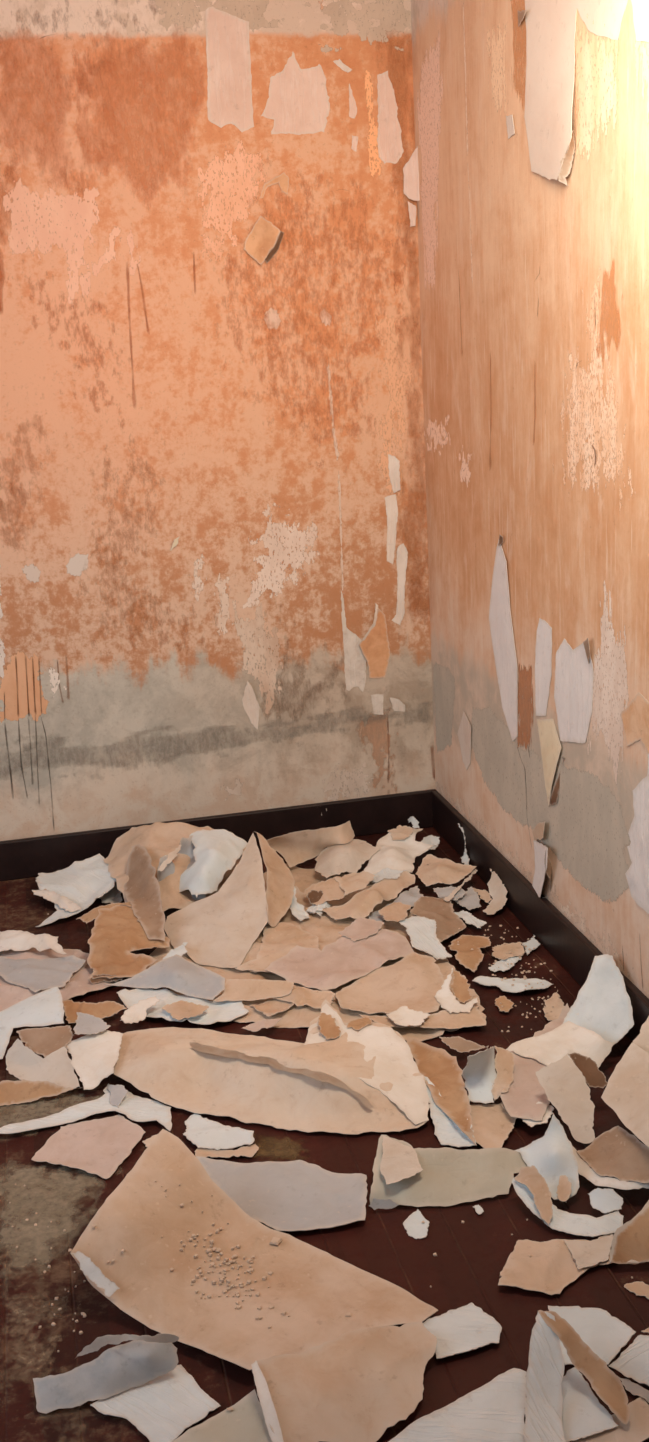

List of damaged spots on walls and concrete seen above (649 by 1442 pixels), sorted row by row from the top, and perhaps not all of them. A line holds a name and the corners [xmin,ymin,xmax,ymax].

flaking render [155,0,284,32]
flaking render [305,0,412,178]